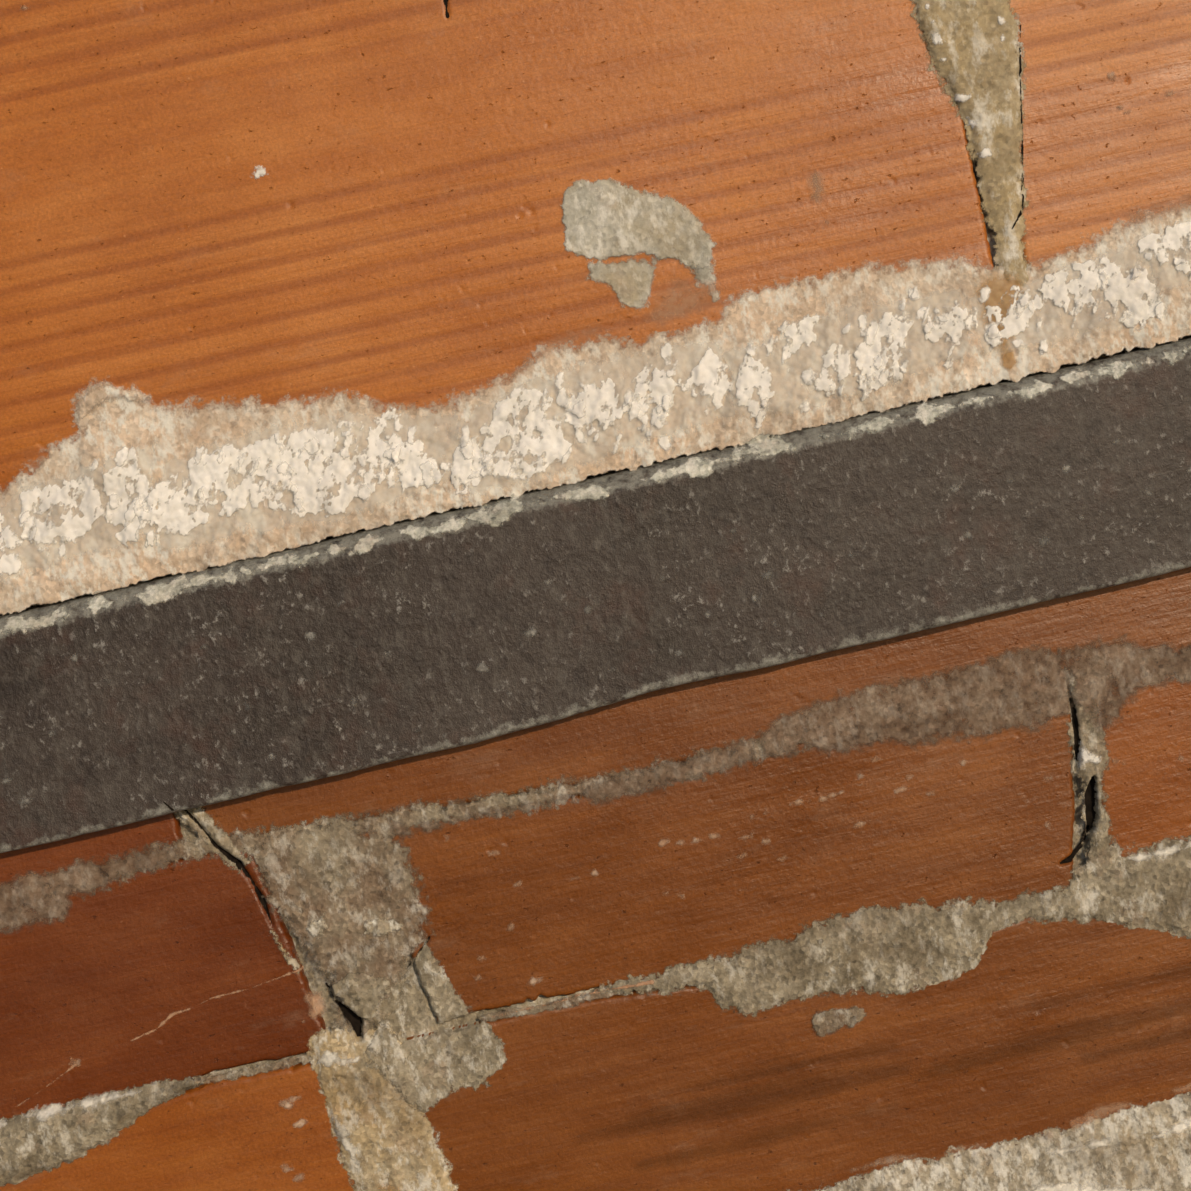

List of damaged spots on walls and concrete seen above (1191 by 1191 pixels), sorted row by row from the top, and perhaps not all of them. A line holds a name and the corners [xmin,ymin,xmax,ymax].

leakage [800,221,1191,413]
leakage [0,314,820,575]
leakage [820,396,993,440]
leakage [0,607,70,634]
leakage [87,534,383,614]
crack [1060,686,1097,864]
crack [163,801,272,924]
crack [325,983,362,1037]